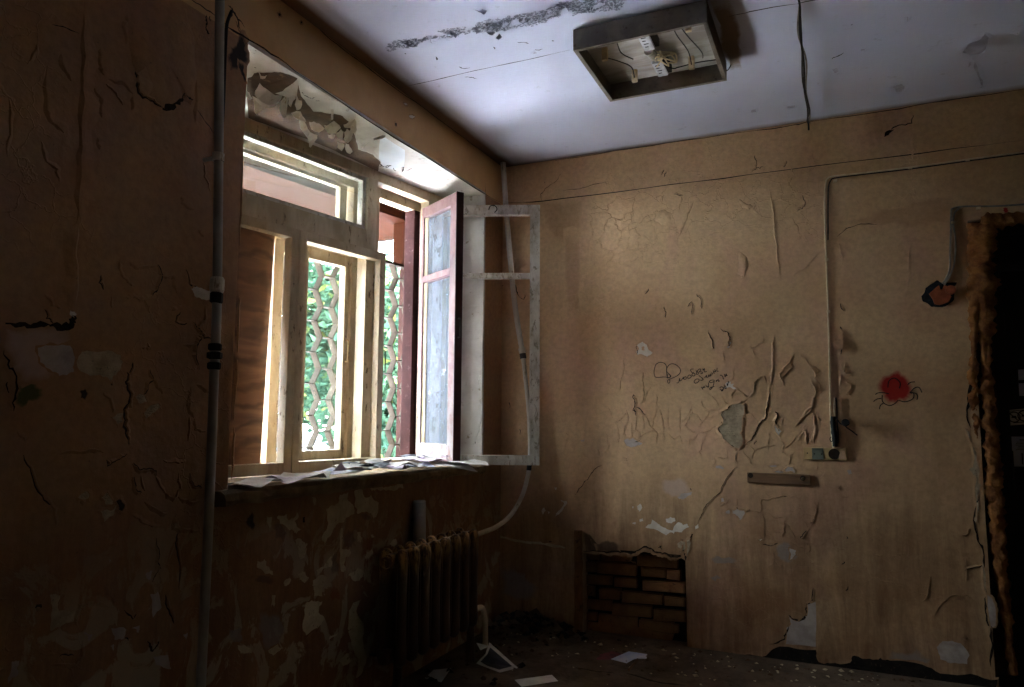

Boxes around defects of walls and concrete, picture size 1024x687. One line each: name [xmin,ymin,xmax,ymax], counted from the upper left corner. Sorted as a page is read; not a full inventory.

crack [27,14,213,182]
peeling [245,67,413,173]
crack [103,306,211,444]
crack [563,289,850,592]
flaking render [715,400,748,451]
peeling [321,489,380,547]
flaking render [584,502,700,563]
peeling [301,583,339,645]
peeling [774,600,818,648]